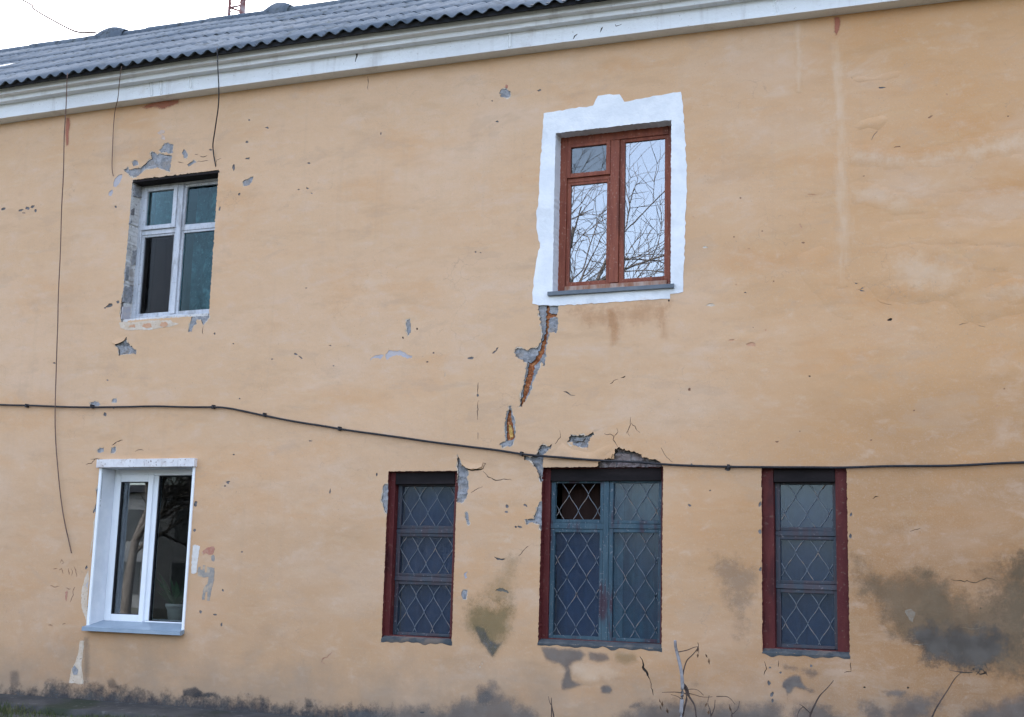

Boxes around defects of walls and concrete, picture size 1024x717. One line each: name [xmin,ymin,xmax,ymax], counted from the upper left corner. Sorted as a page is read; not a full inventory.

flaking render [108,130,221,224]
peeling [104,250,215,356]
peeling [370,318,418,360]
crack [500,305,559,449]
flaking render [456,454,486,526]
flaking render [524,430,663,483]
leakage [470,605,512,656]
leakage [860,552,1024,678]
leakage [4,639,534,717]
leakage [543,648,625,693]
leakage [625,661,806,717]